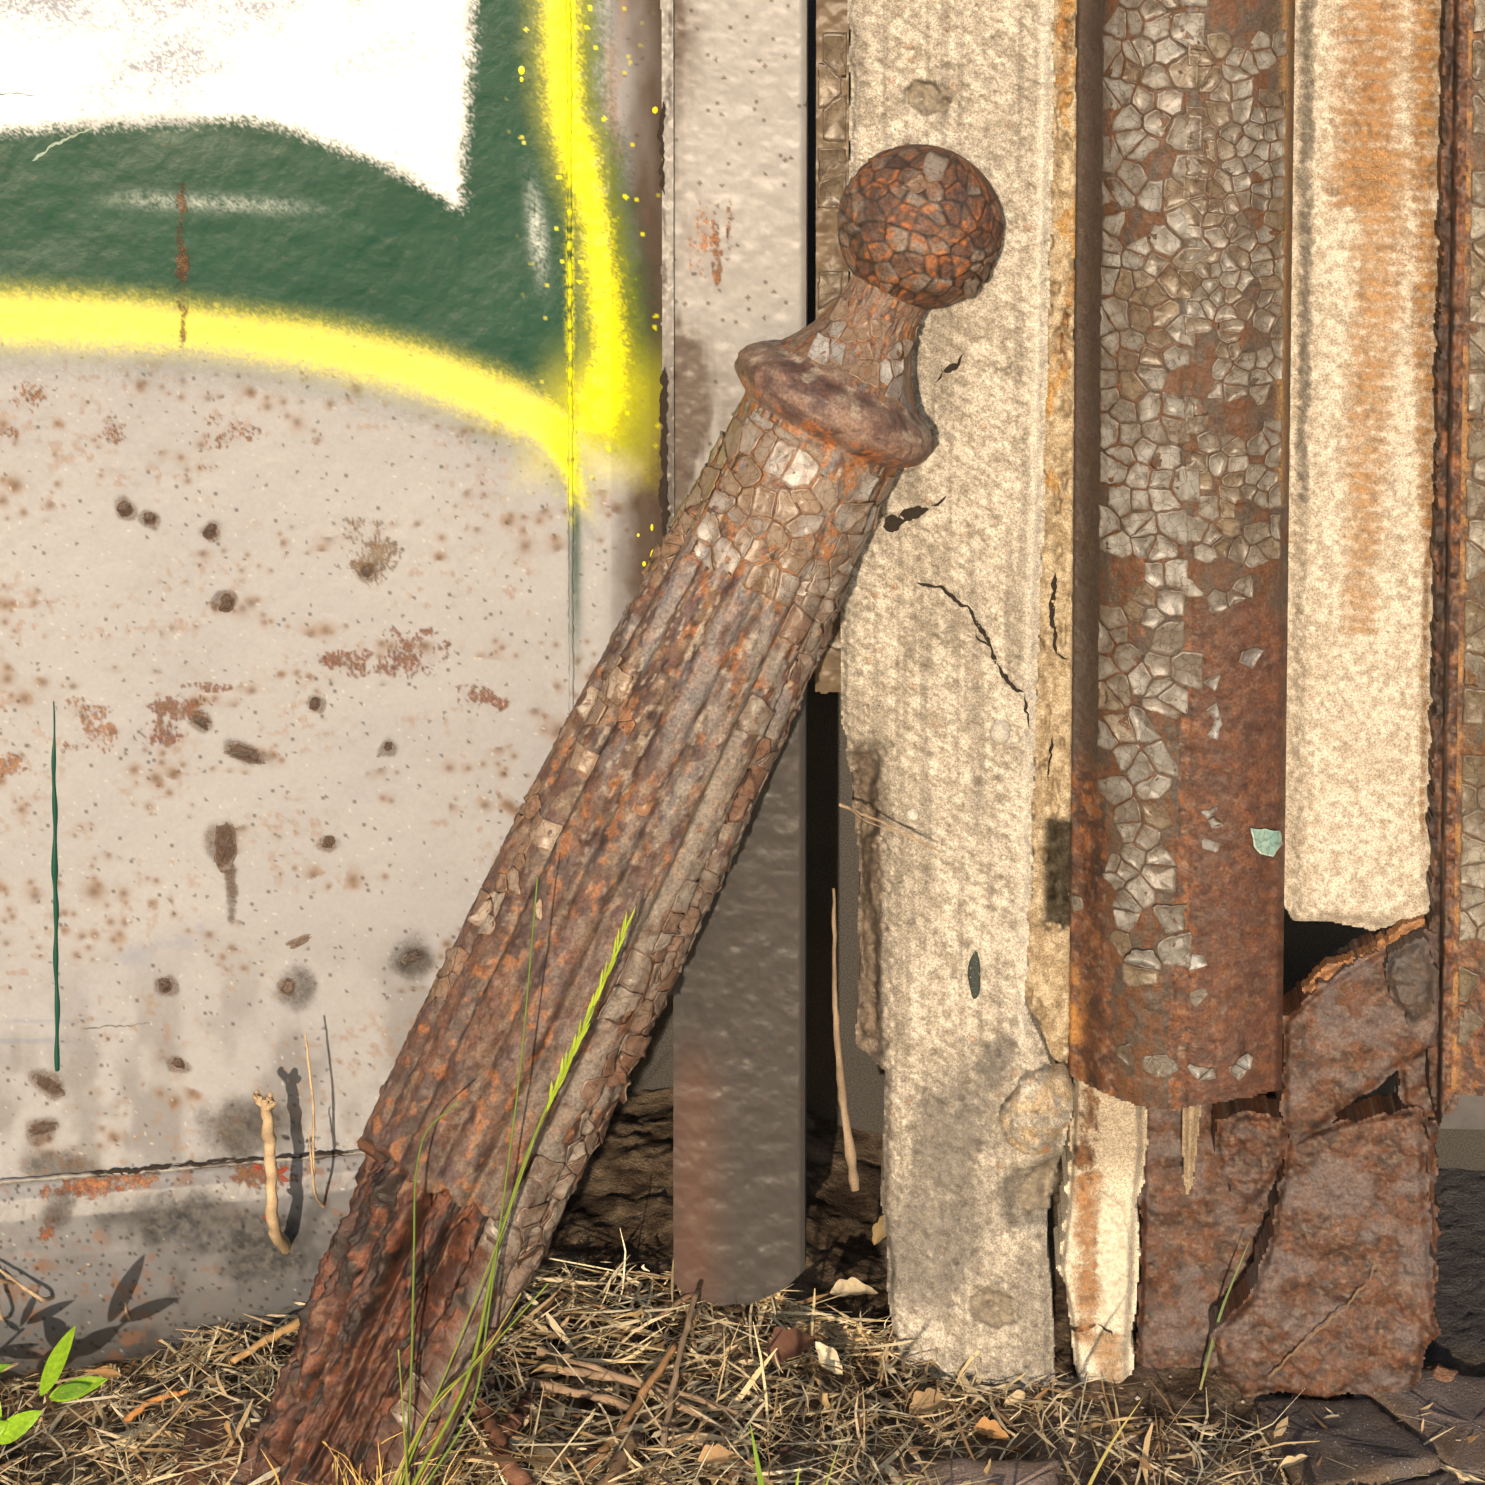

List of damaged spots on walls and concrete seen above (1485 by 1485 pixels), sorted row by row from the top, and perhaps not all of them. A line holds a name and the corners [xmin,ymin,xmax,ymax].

corrosion [1333,0,1441,682]
peeling [1097,0,1287,988]
peeling [1463,170,1485,726]
corrosion [63,683,232,752]
corrosion [223,741,266,765]
crack [917,582,1054,781]
crack [1049,573,1066,659]
corrosion [208,821,237,920]
peeling [1458,755,1485,943]
peeling [1117,1043,1253,1081]
corrosion [1073,1087,1122,1382]
spalling [1095,1193,1133,1315]